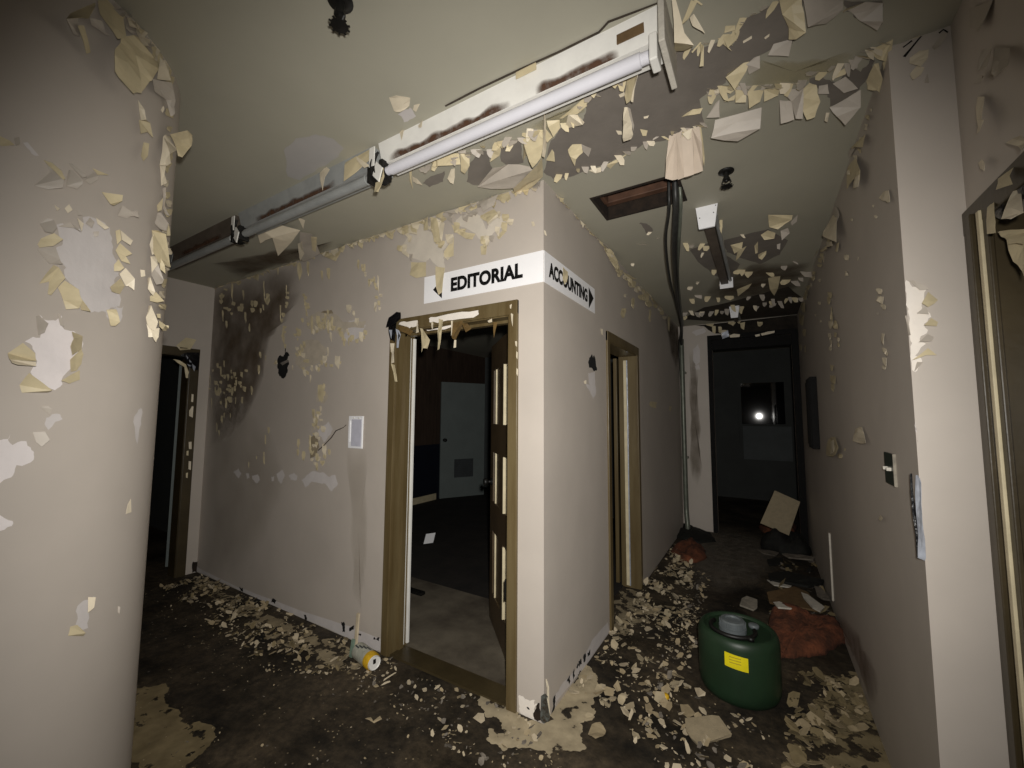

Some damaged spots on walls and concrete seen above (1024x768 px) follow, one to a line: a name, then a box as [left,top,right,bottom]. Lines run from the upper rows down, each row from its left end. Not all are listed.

corrosion [539,54,614,93]
corrosion [394,106,502,159]
peeling [0,0,196,393]
peeling [209,0,893,435]
peeling [986,168,1024,275]
damp [217,287,286,415]
peeling [905,280,938,372]
flaking render [0,406,62,483]
peeling [233,384,338,491]
flaking render [0,515,13,531]